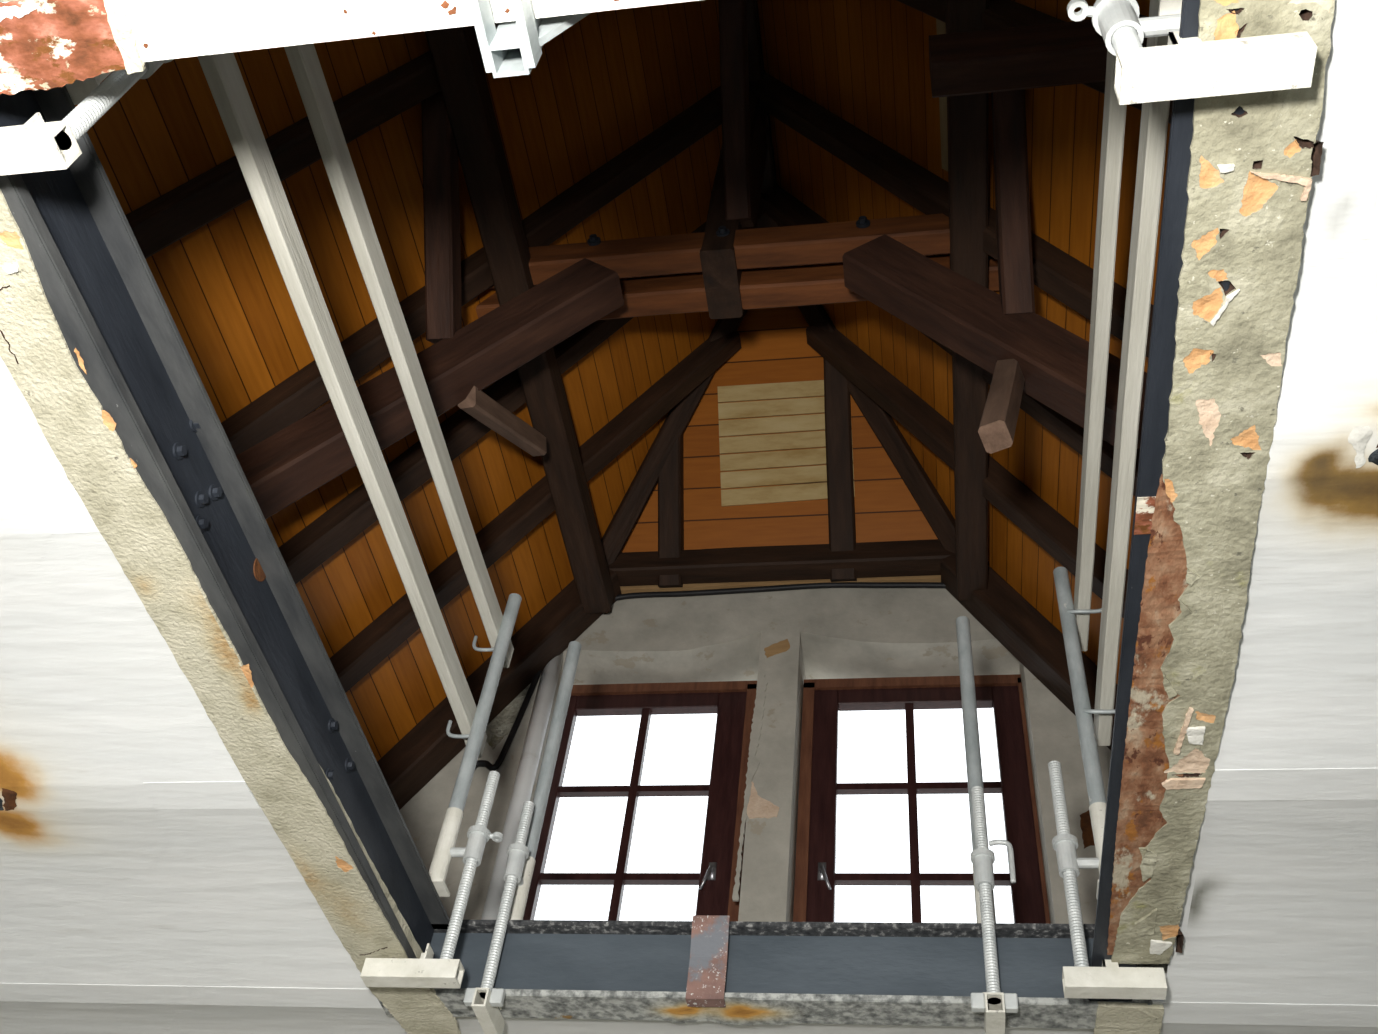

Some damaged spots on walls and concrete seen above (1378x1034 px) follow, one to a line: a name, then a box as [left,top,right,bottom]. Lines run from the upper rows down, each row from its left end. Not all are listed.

spalling [1214,0,1247,40]
spalling [1288,0,1333,21]
spalling [1199,136,1324,216]
spalling [1191,228,1240,326]
crack [0,330,19,364]
spalling [1183,348,1216,373]
spalling [1260,352,1282,366]
spalling [1196,398,1221,446]
spalling [1231,425,1261,459]
peeling [1348,426,1373,468]
corrosion [1107,474,1200,955]
corrosion [0,657,169,884]